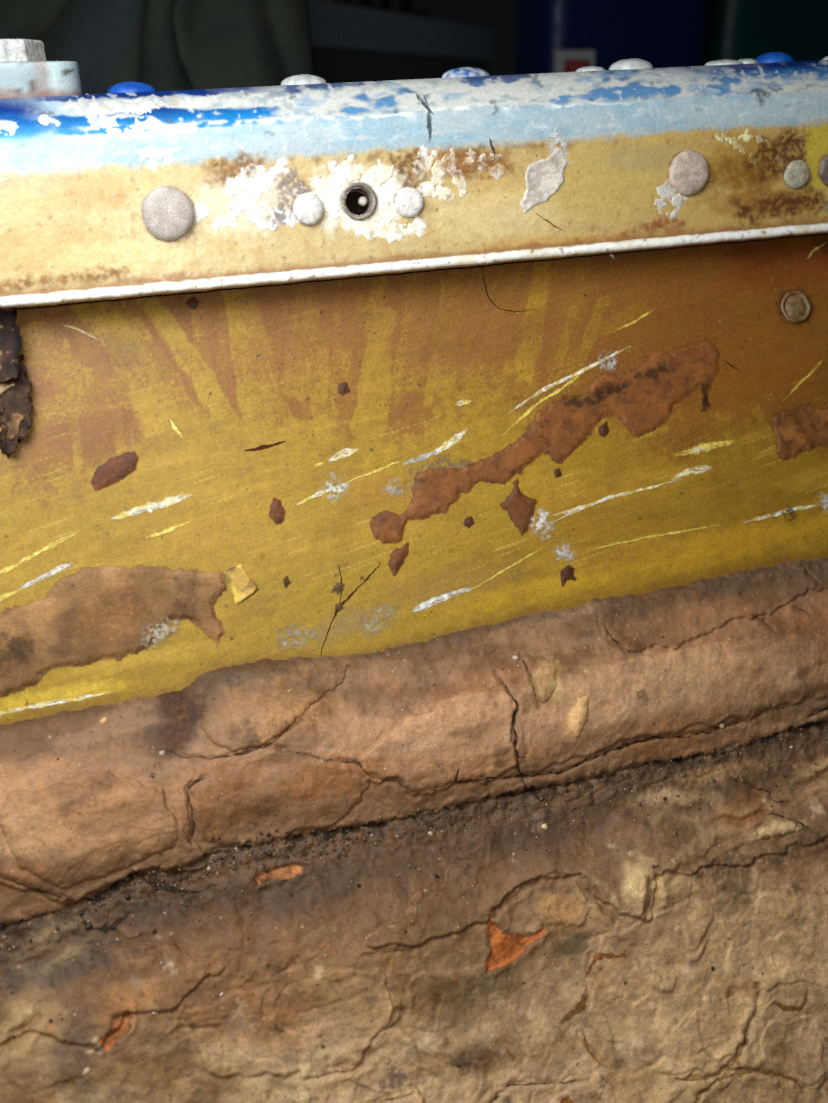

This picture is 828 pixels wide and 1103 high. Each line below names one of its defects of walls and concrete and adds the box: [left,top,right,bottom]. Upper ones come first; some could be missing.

peeling [0,120,18,136]
peeling [38,94,202,172]
corrosion [214,153,262,182]
corrosion [390,152,421,187]
corrosion [446,151,510,178]
peeling [715,129,768,165]
corrosion [720,132,823,222]
peeling [0,565,259,697]
crack [320,563,381,656]
crack [0,660,828,932]
water stain [695,838,828,904]
crack [490,1080,577,1103]